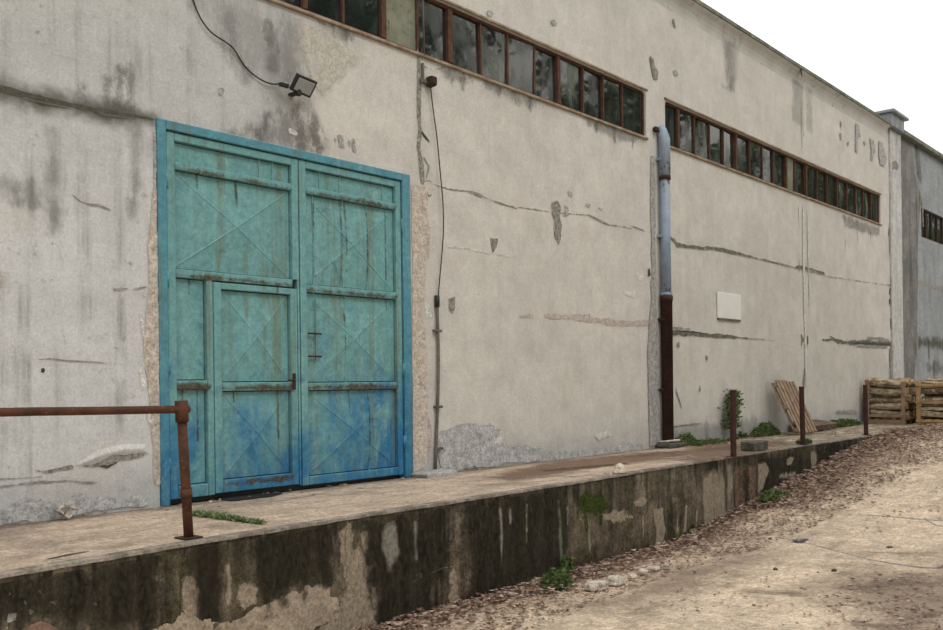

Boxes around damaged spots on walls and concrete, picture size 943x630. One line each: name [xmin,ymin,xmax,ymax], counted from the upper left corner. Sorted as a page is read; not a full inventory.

damp [0,86,152,121]
crack [417,48,644,231]
crack [797,68,805,151]
flaking render [411,156,660,472]
crack [671,205,892,387]
flaking render [840,121,921,402]
crack [0,452,148,488]
spalling [28,621,57,630]
flaking render [153,521,379,630]
damp [257,528,352,605]
damp [363,509,452,628]
damp [470,490,568,601]